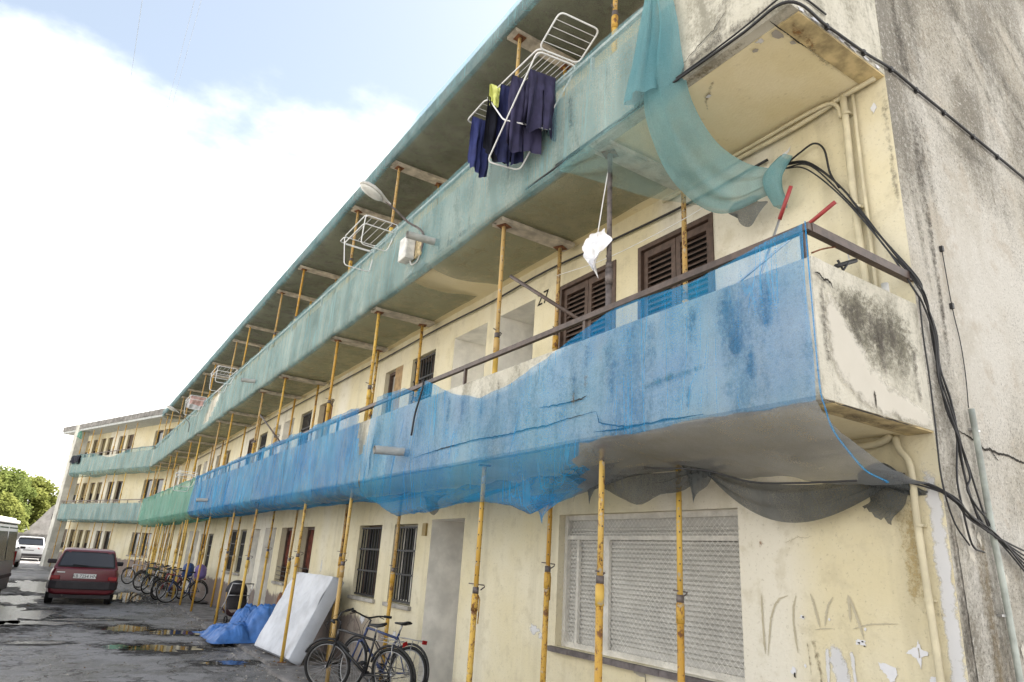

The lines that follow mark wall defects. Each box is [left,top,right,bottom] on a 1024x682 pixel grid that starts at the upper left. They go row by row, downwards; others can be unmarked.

damp [839,291,917,375]
crack [960,431,1024,464]
peeling [906,642,928,667]
peeling [878,662,898,682]